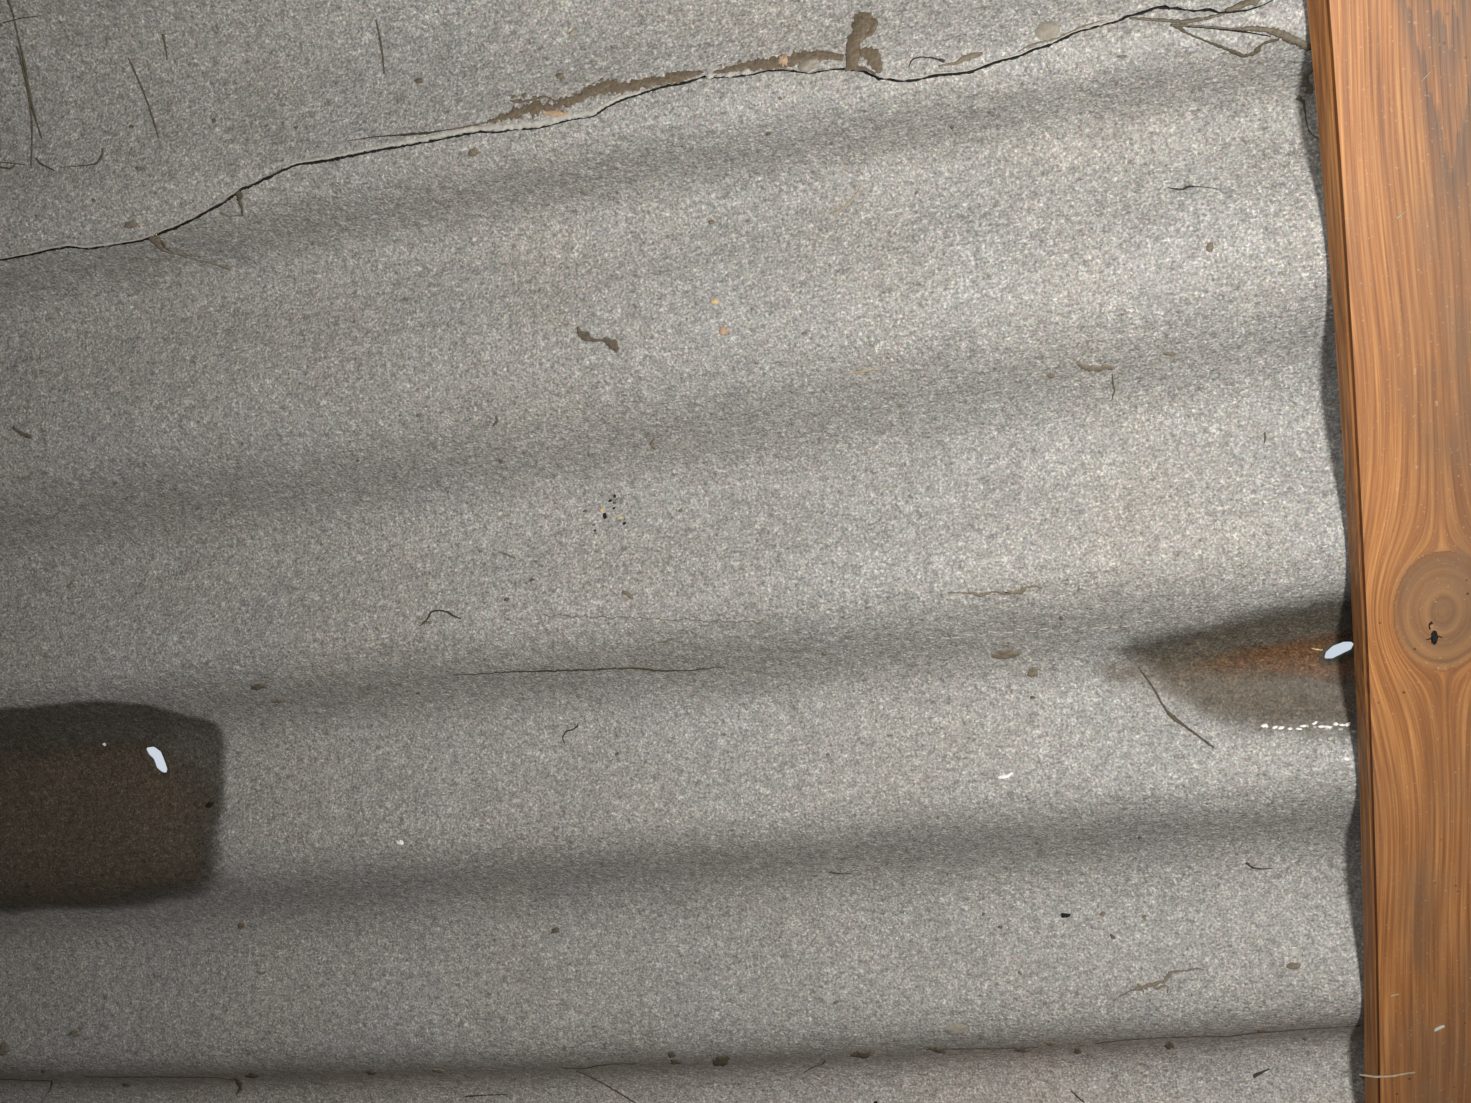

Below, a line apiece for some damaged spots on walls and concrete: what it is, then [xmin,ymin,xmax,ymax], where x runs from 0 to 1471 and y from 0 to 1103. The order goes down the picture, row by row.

crack [0,0,1273,261]
damp [0,702,223,911]